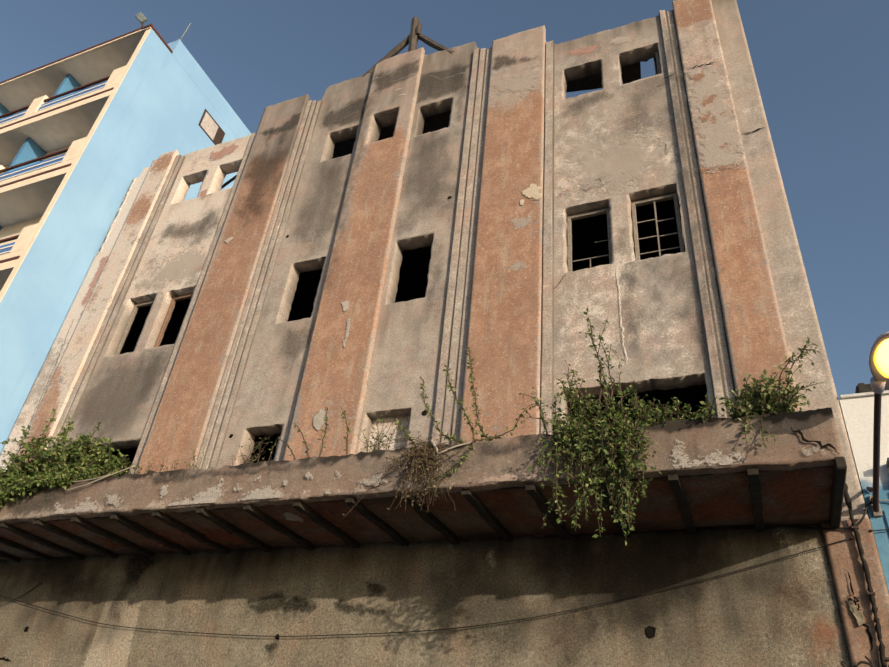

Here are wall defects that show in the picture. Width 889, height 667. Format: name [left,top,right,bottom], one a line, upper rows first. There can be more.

damp [493,56,530,70]
peeling [507,183,541,230]
damp [166,212,218,243]
crack [613,258,637,362]
spalling [313,408,326,430]
peeling [668,439,746,469]
crack [791,428,840,454]
peeling [53,493,123,514]
peeling [159,476,294,506]
damp [250,594,315,612]
damp [336,600,384,614]
crack [862,624,873,652]